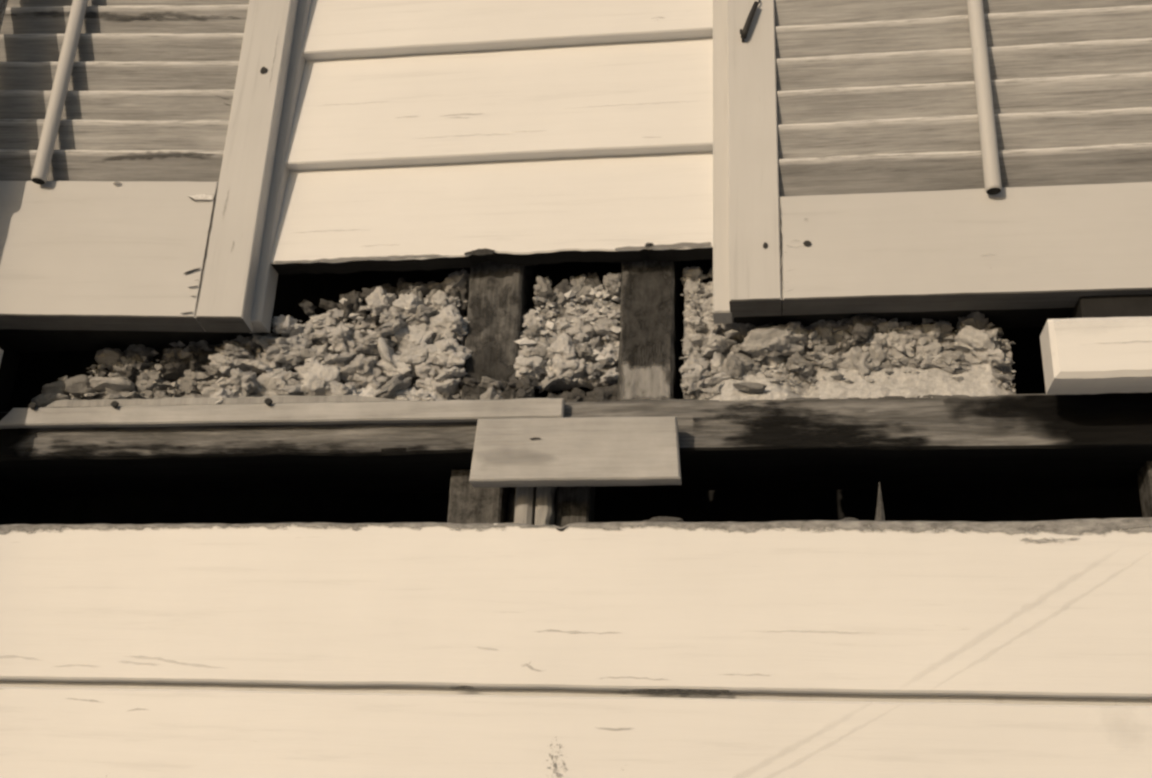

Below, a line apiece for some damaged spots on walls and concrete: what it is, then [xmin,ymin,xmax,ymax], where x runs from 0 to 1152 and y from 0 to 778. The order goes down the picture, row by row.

spalling [733,382,767,393]
damp [715,400,927,449]
peeling [0,517,1152,543]